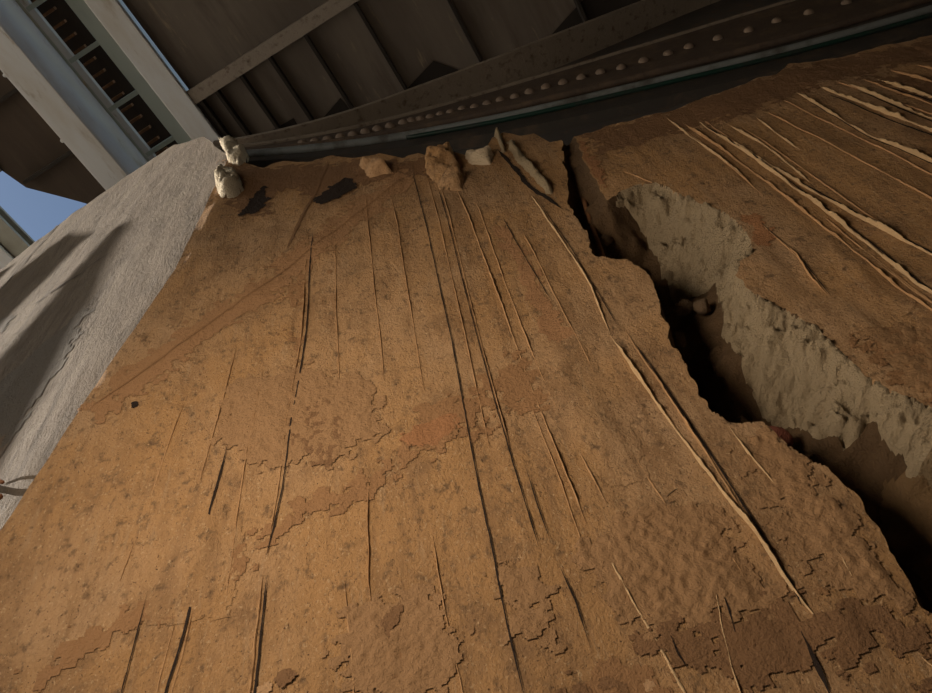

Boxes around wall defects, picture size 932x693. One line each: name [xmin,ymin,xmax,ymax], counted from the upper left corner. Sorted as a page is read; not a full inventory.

crack [807,86,932,164]
crack [498,137,932,613]
crack [670,635,687,667]
crack [724,597,735,632]
water stain [555,589,932,693]
crack [801,631,830,693]